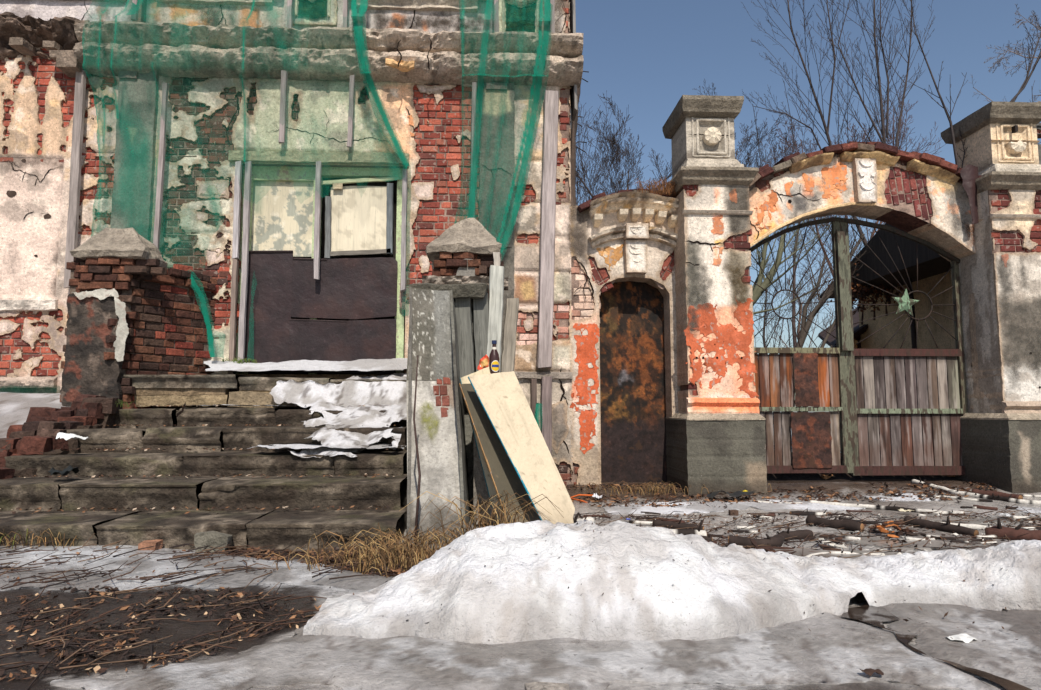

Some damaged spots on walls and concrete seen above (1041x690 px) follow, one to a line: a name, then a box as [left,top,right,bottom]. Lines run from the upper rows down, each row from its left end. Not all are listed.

crack [390,10,439,71]
spalling [0,48,116,163]
spalling [78,137,115,235]
spalling [161,77,257,339]
spalling [397,84,480,310]
peeling [711,154,848,267]
spalling [884,160,932,226]
spalling [988,190,1041,267]
spalling [0,309,64,377]
peeling [72,288,129,362]
peeling [552,244,624,485]
peeling [684,296,759,398]